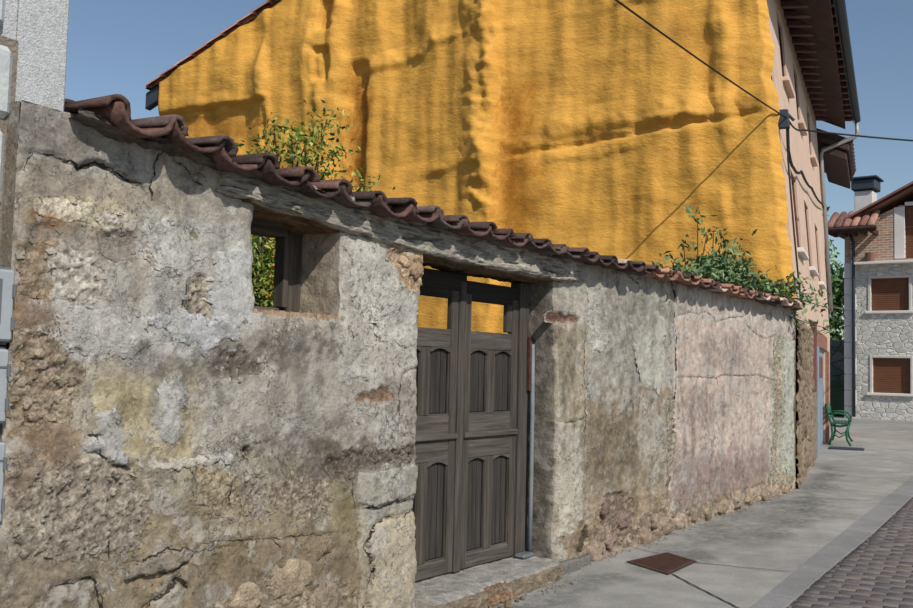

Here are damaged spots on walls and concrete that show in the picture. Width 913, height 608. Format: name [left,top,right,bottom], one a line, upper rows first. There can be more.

crack [24,150,205,199]
spalling [6,195,266,436]
flaking render [332,236,424,407]
flaking render [543,286,618,353]
flaking render [151,373,190,448]
crack [663,282,775,491]
spalling [11,408,418,580]
crack [52,576,103,608]
crack [107,533,332,608]
spalling [210,511,417,608]
crack [352,481,413,608]